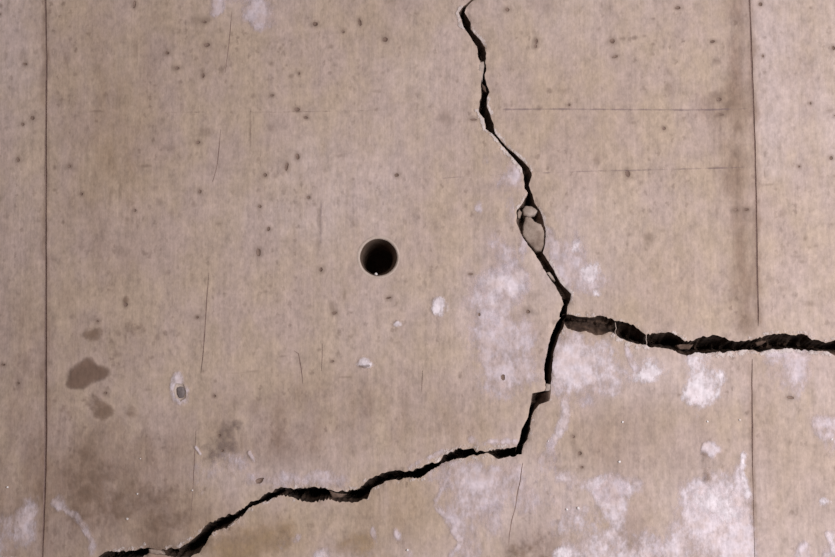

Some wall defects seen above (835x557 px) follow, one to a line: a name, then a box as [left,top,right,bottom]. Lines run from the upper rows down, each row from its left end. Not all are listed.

crack [456,0,574,319]
leakage [68,359,108,388]
crack [201,275,209,370]
crack [99,314,835,557]